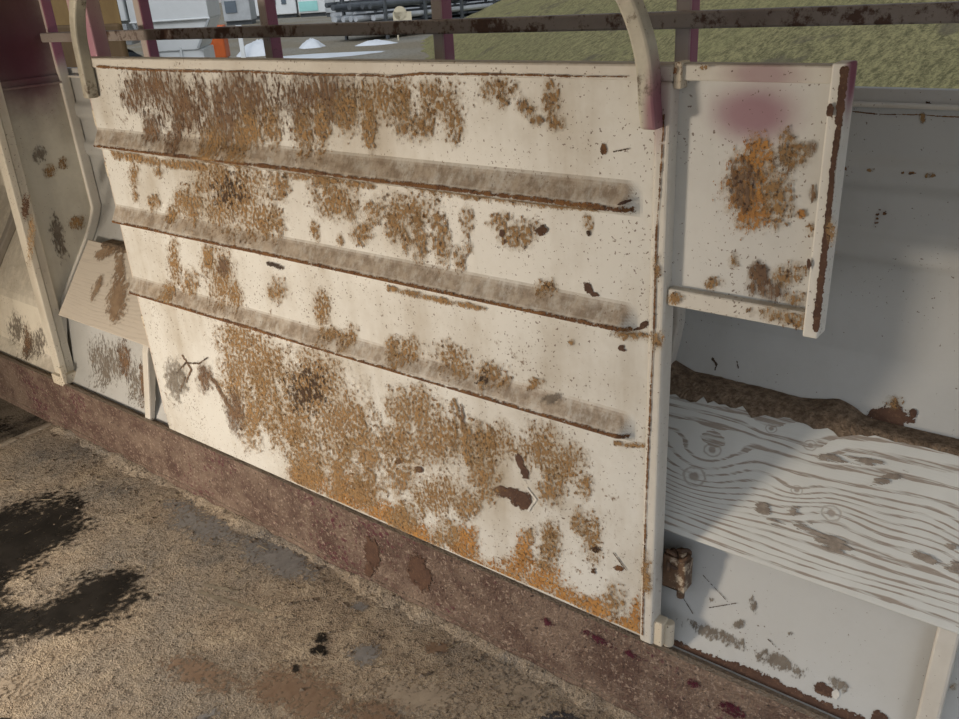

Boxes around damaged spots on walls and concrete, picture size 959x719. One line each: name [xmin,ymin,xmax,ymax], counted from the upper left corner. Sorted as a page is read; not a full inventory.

rust [32,146,68,178]
rust [712,125,816,240]
rust [21,190,36,267]
rust [731,251,807,330]
rust [93,65,666,635]
peeling [867,396,917,426]
damp [0,486,151,656]